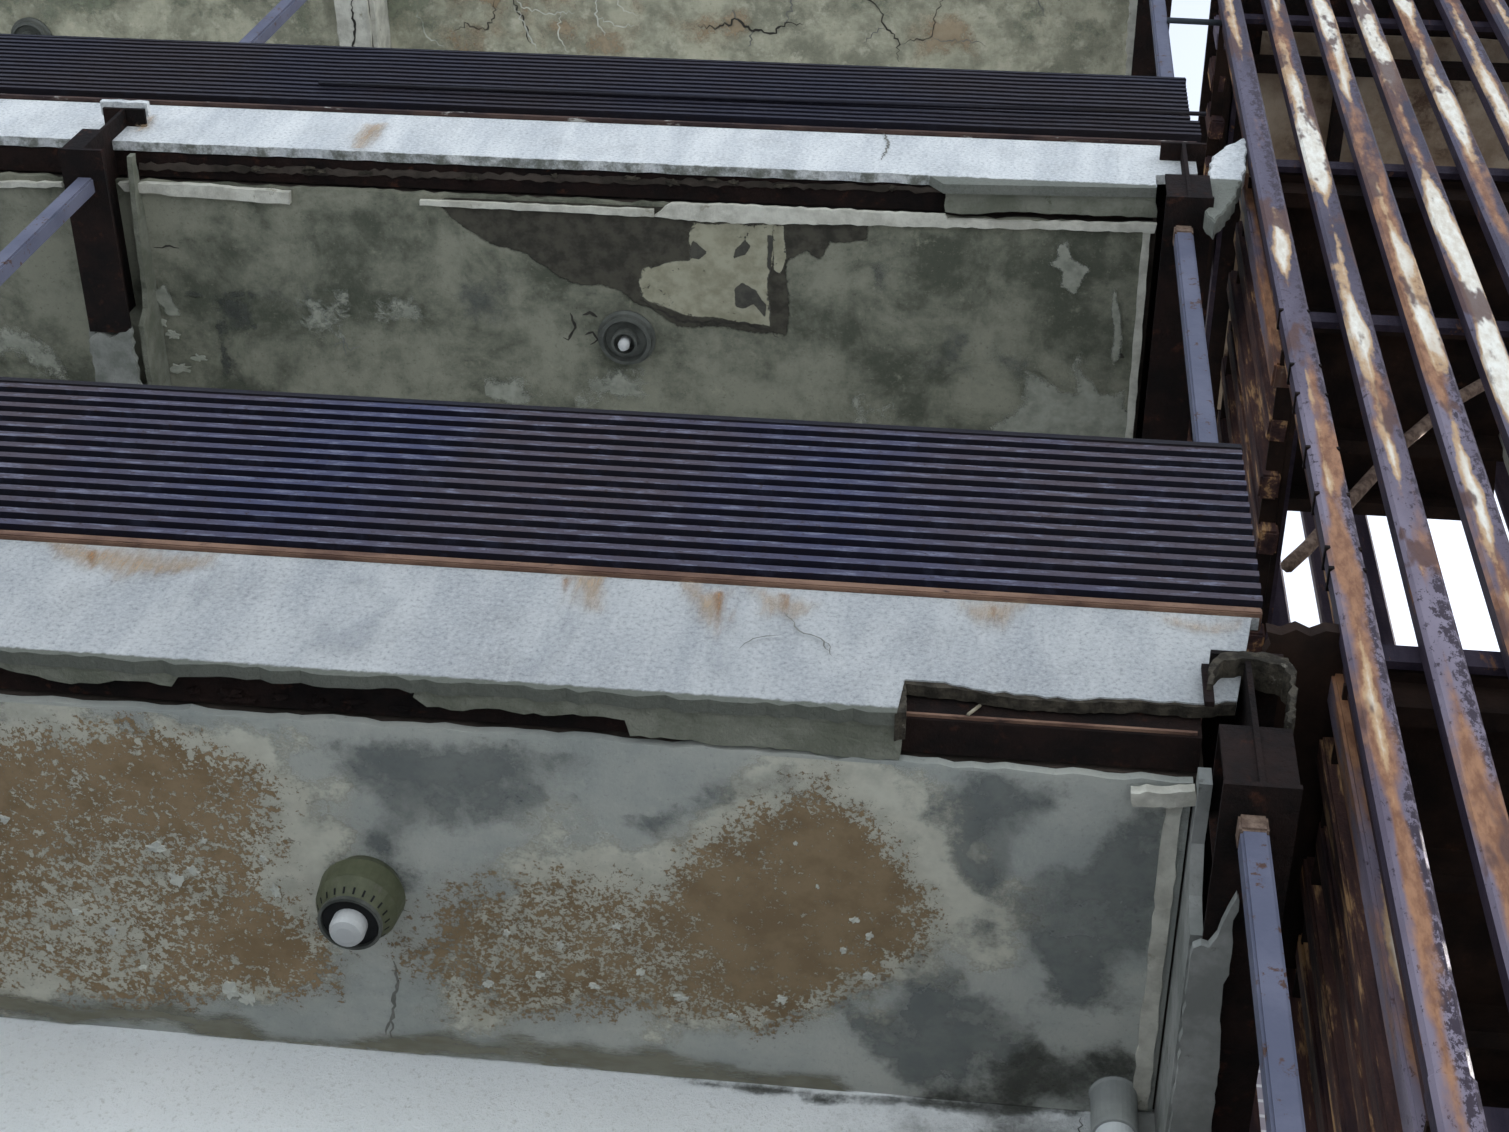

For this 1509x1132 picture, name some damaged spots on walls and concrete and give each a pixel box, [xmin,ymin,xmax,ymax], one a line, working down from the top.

crack [410,0,636,52]
crack [701,0,802,46]
crack [864,0,981,61]
flaking render [139,162,940,339]
water stain [347,740,566,824]
water stain [924,773,1052,900]
water stain [1031,812,1164,1006]
water stain [838,971,1136,1132]
water stain [737,1085,845,1104]